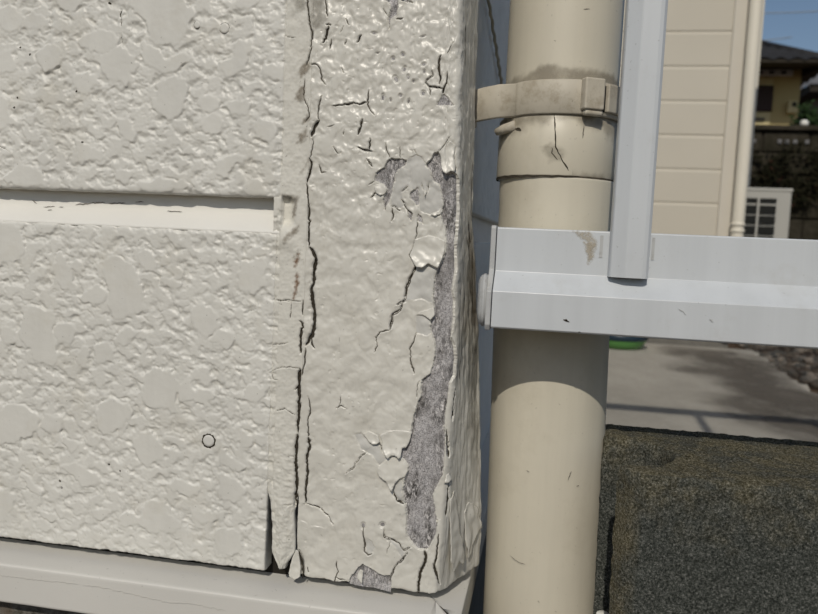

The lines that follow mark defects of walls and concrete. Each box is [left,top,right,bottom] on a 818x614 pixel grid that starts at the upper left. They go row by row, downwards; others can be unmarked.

peeling [384,0,410,28]
crack [496,117,614,182]
crack [272,0,374,506]
peeling [334,140,482,592]
crack [299,551,309,578]
crack [417,534,439,593]